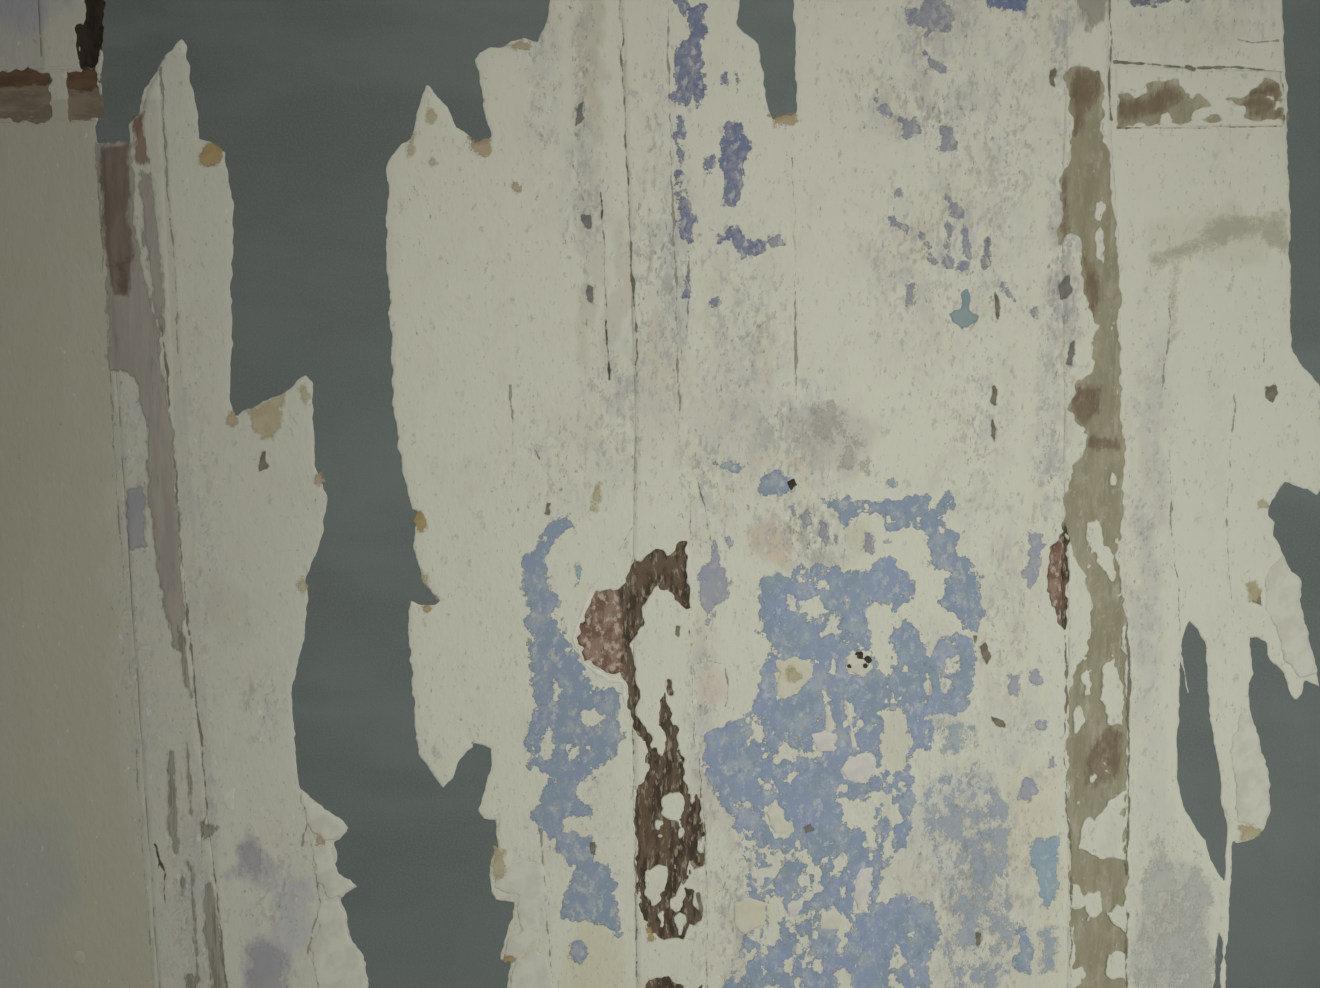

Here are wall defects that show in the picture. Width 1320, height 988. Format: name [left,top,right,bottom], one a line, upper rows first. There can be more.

peeling [0,0,369,988]
peeling [386,0,1320,988]